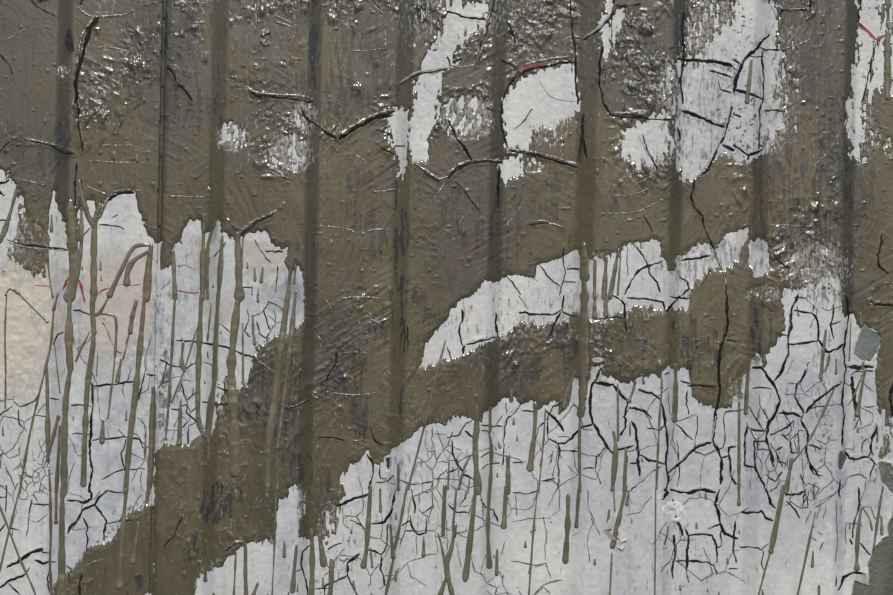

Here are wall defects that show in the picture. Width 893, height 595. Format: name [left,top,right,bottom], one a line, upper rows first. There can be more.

crack [0,0,205,208]
crack [246,0,893,595]
crack [0,201,286,595]
peeling [838,451,846,470]
peeling [878,462,893,493]
peeling [604,519,628,550]
peeling [852,515,893,595]